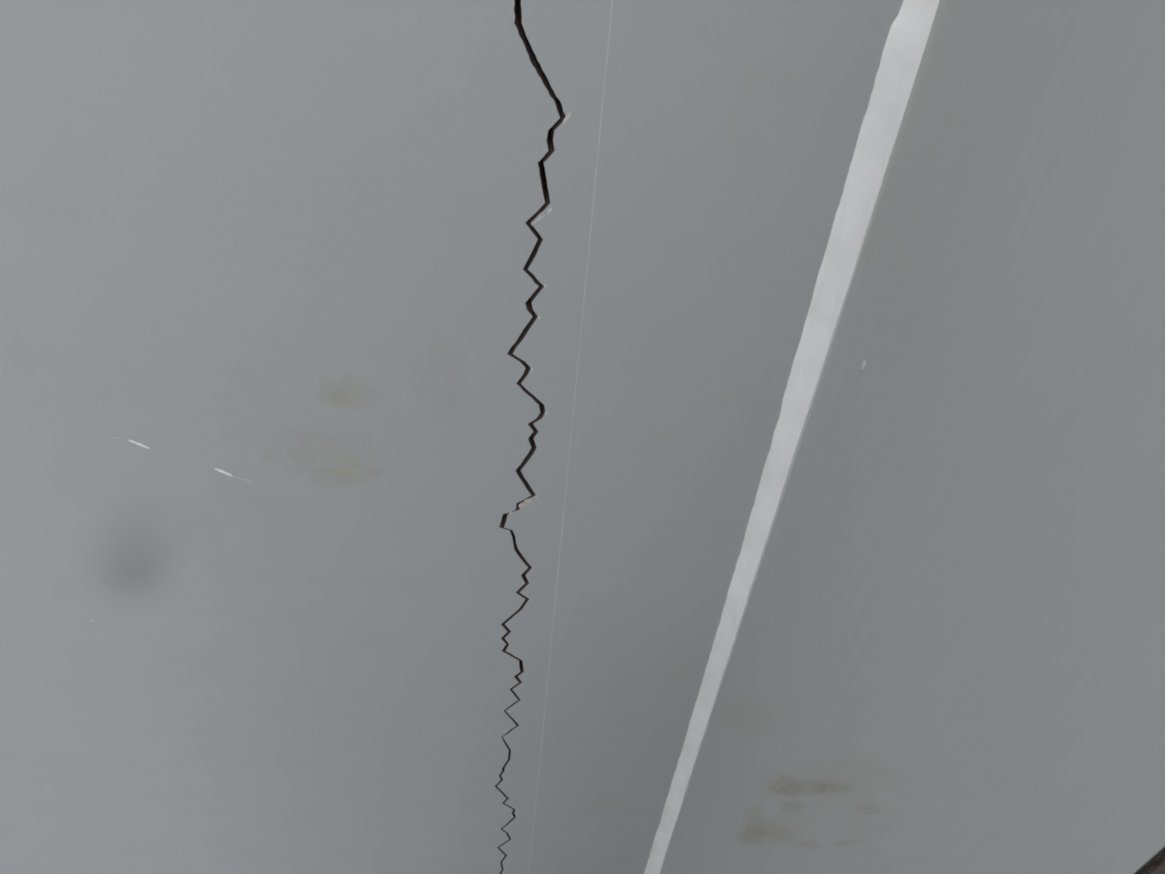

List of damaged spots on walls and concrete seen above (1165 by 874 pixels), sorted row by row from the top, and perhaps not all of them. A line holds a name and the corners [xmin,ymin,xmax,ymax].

crack [495,0,572,874]